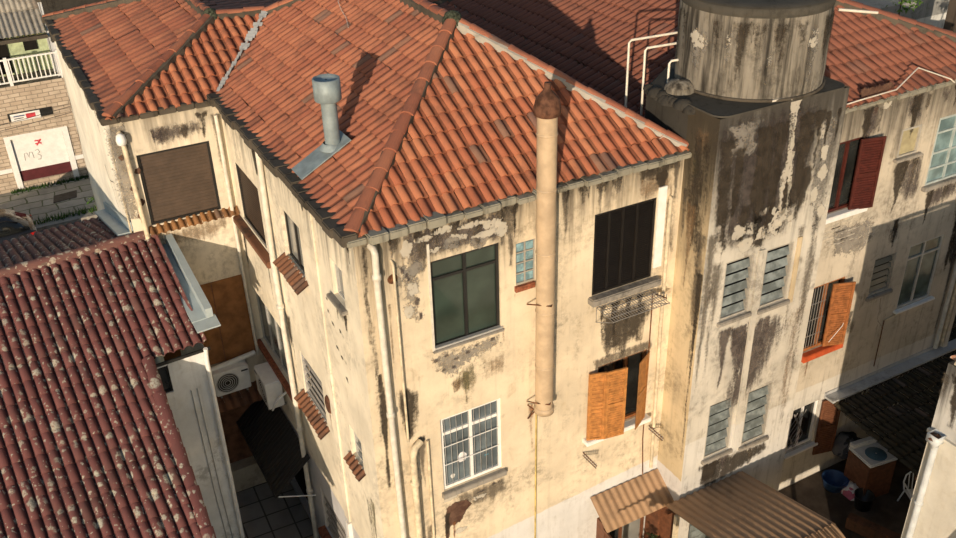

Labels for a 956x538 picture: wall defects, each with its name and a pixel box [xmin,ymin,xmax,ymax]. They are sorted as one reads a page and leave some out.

water stain [151,111,226,161]
peeling [397,214,508,320]
water stain [641,99,827,382]
water stain [453,372,469,401]
water stain [717,316,783,406]
water stain [942,374,956,427]